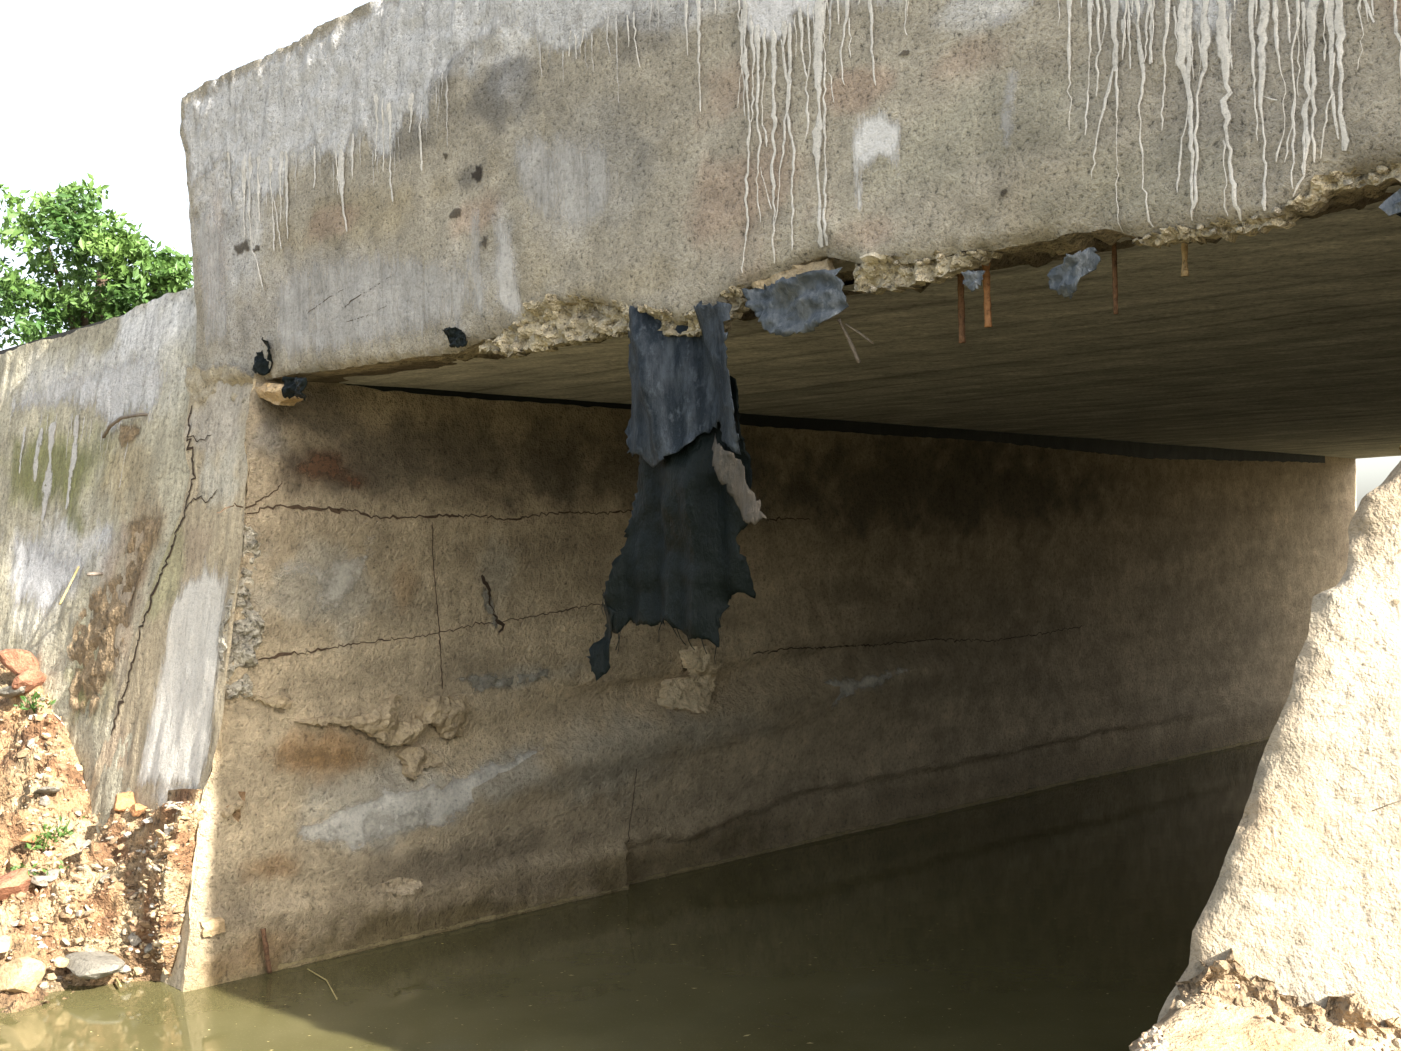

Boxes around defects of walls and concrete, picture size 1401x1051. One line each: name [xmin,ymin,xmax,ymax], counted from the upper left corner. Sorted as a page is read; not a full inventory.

efflorescence [1393,0,1401,77]
efflorescence [183,0,659,289]
efflorescence [681,0,909,273]
efflorescence [1058,0,1375,232]
efflorescence [496,222,520,314]
spalling [474,294,702,359]
spalling [852,249,1003,343]
spalling [1112,163,1401,315]
peeling [218,524,470,782]
crack [111,405,632,734]
crack [753,625,1083,654]
flaking render [1171,948,1401,1040]